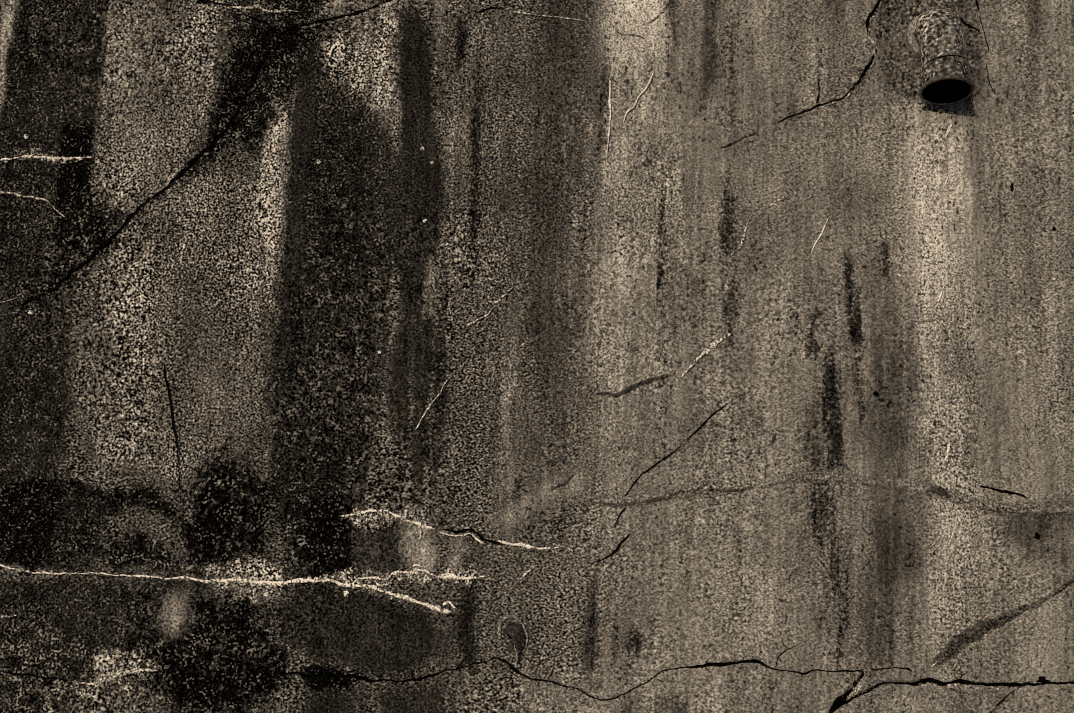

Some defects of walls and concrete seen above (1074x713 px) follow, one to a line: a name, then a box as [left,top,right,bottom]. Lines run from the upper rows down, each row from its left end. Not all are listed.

water stain [701,0,740,136]
crack [720,0,882,148]
crack [959,0,993,90]
crack [21,0,396,305]
water stain [0,0,700,713]
crack [442,529,502,545]
crack [589,403,728,564]
water stain [804,256,868,670]
water stain [865,119,985,700]
crack [980,486,1028,498]
crack [277,645,1074,713]
water stain [891,692,938,713]